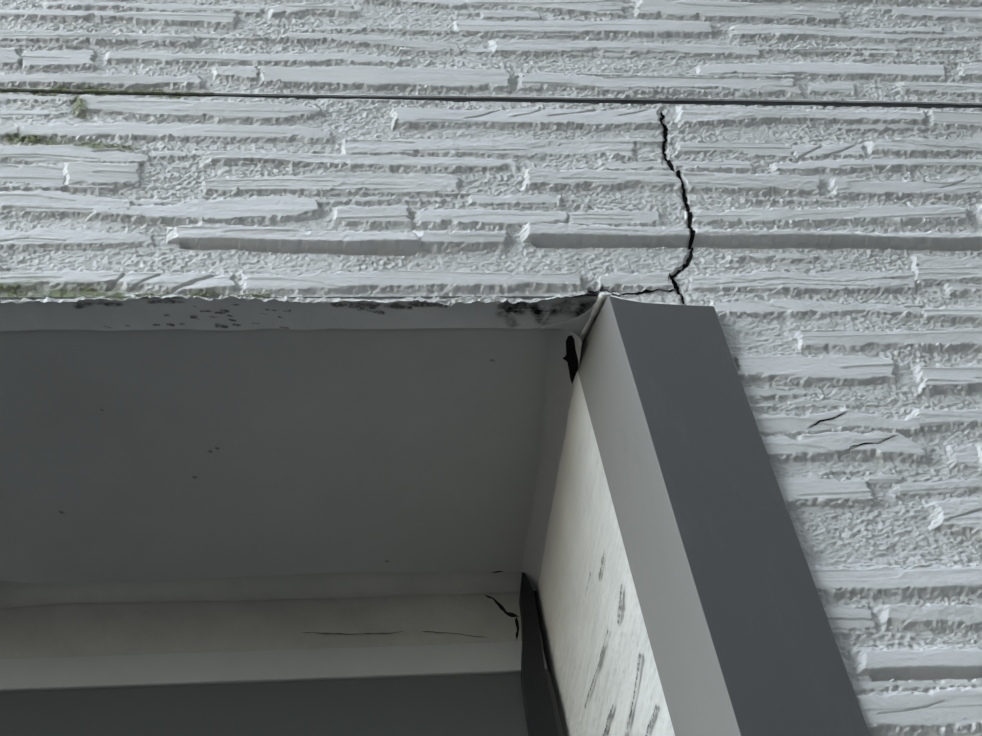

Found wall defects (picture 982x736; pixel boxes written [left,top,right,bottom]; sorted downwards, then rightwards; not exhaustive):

crack [603,112,695,305]
crack [563,335,578,384]
crack [485,571,519,641]